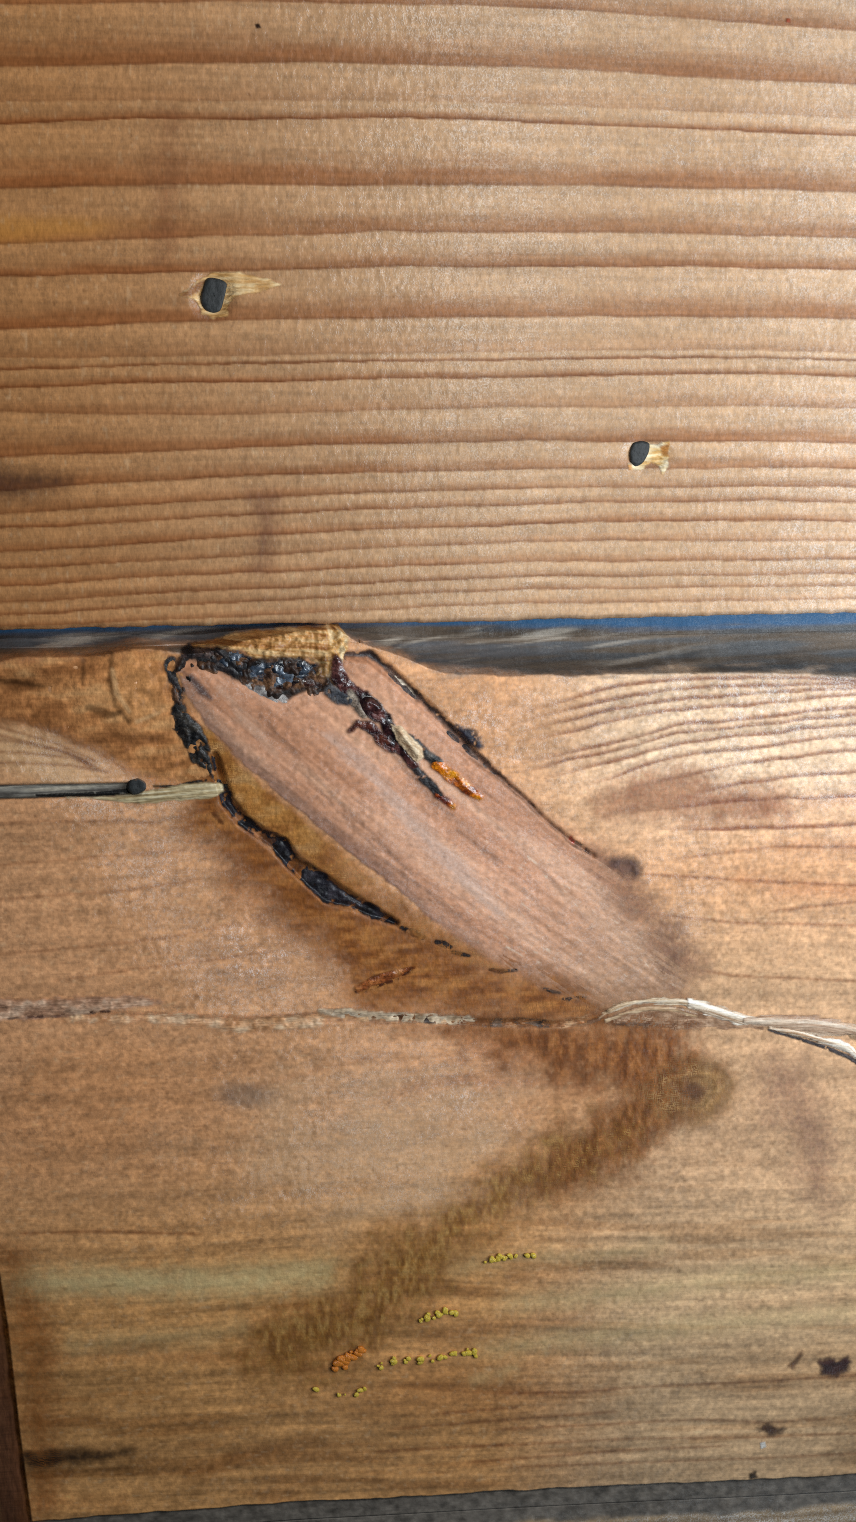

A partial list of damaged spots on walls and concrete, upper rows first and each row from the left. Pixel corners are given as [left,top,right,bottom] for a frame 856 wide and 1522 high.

spalling [164,643,335,706]
damp [189,769,698,1368]